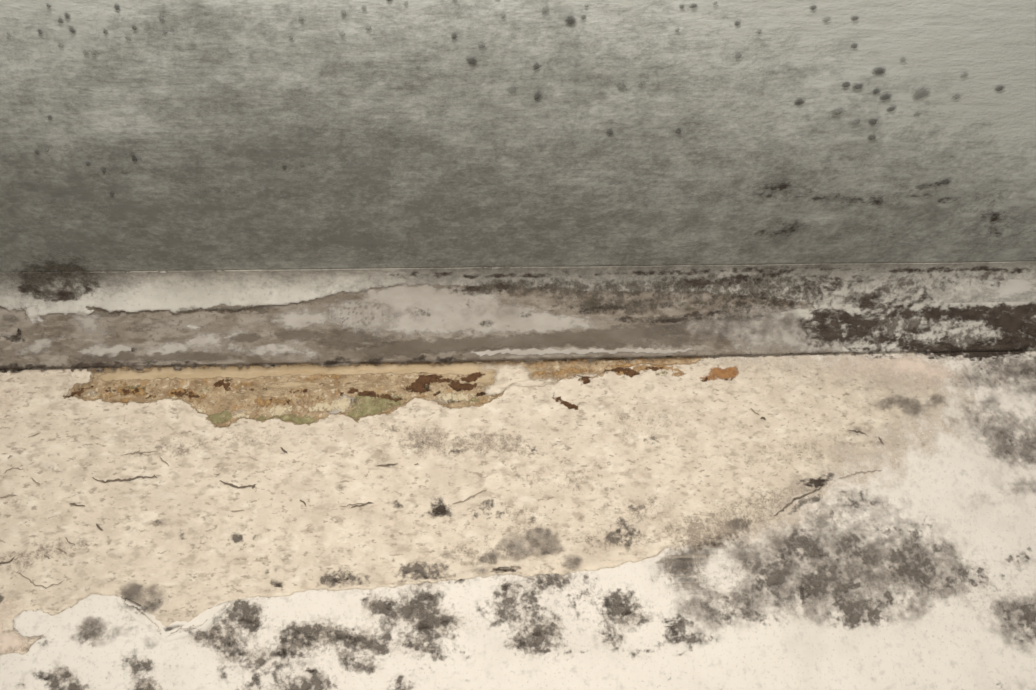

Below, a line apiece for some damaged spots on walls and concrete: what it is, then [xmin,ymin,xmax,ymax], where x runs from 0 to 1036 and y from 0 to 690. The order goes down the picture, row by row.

leakage [0,121,1036,392]
peeling [982,278,1036,299]
leakage [975,417,1036,463]
peeling [0,283,962,655]
leakage [657,519,983,628]
leakage [123,584,158,611]
leakage [189,562,455,690]
leakage [482,554,588,653]
leakage [602,589,648,624]
leakage [665,615,702,655]
leakage [33,672,84,690]
leakage [126,660,152,690]